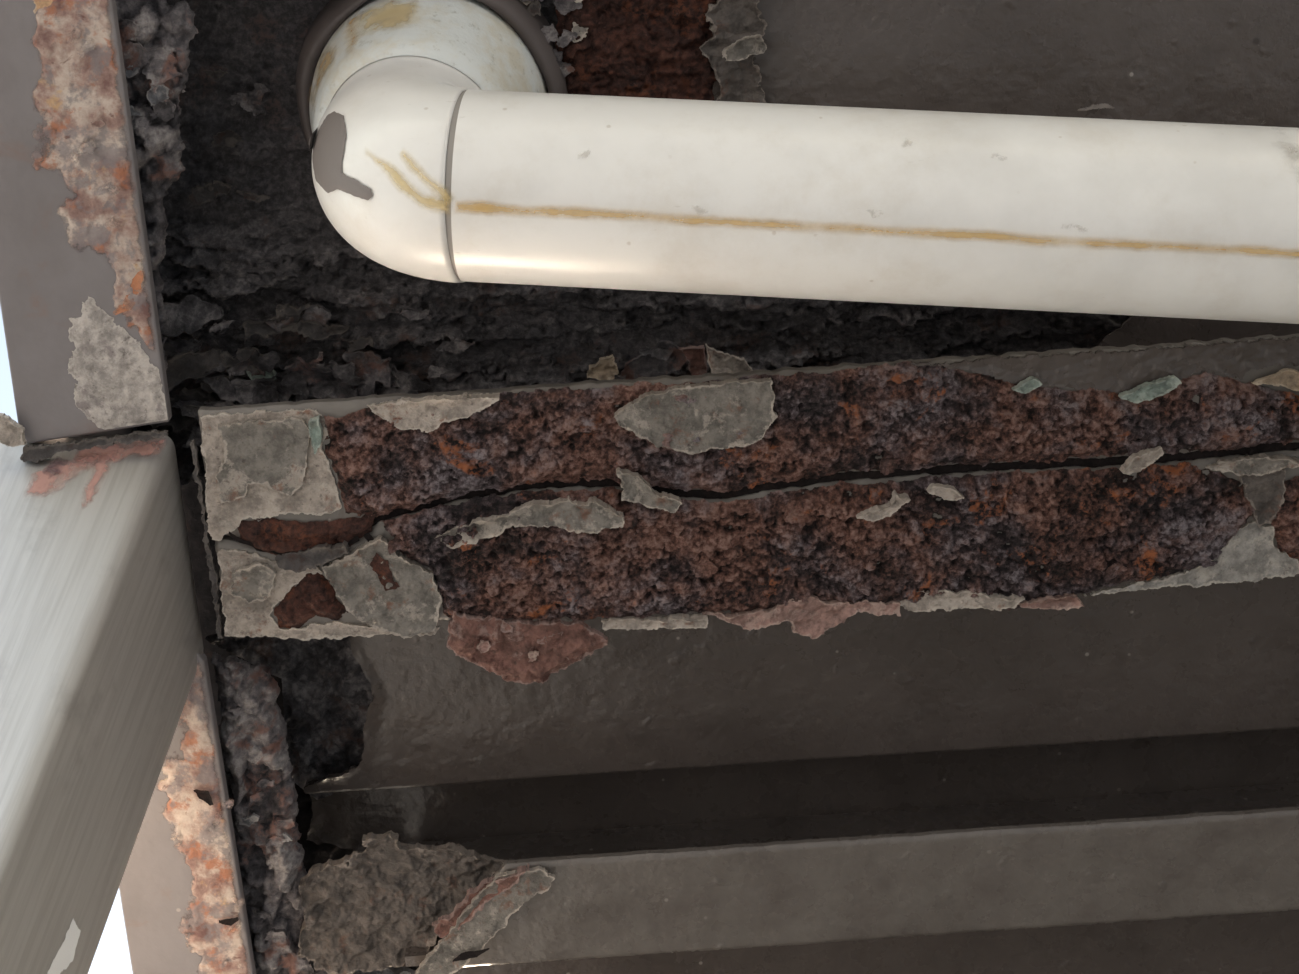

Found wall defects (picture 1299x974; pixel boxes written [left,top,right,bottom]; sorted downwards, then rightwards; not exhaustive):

peeling [699,0,767,103]
corrosion [20,0,1299,685]
peeling [367,392,500,433]
peeling [614,344,778,455]
crack [229,532,284,555]
peeling [275,535,443,639]
crack [333,478,621,545]
peeling [435,467,682,549]
crack [652,442,1299,499]
corrosion [157,652,328,974]
peeling [297,831,555,974]
corrosion [432,863,530,938]